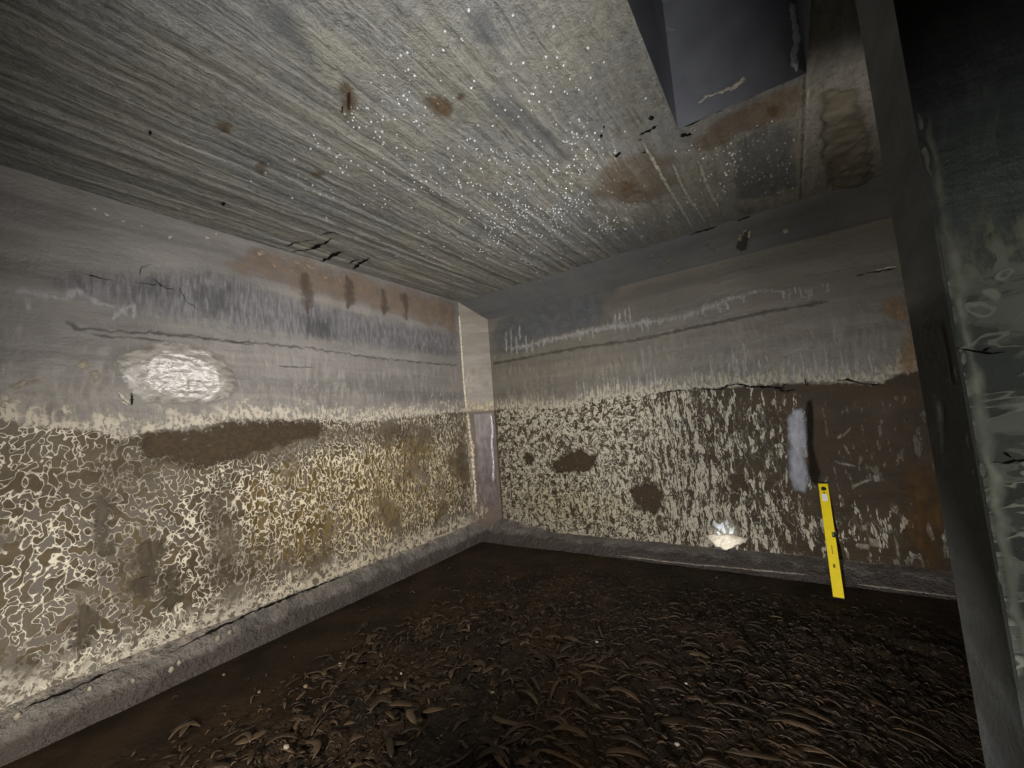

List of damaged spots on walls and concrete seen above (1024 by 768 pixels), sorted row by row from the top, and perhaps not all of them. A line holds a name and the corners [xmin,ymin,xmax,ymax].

rust [341,86,354,113]
crack [287,232,370,269]
crack [657,379,809,394]
crack [835,378,879,386]
water stain [0,110,1024,710]